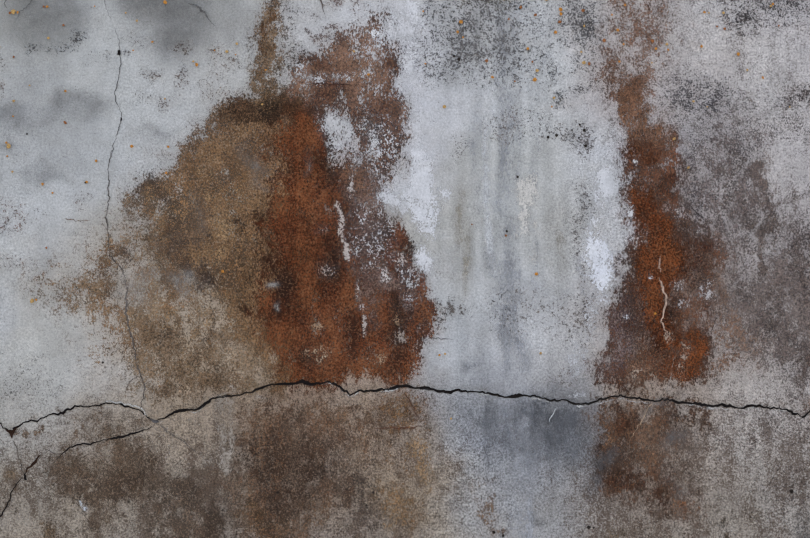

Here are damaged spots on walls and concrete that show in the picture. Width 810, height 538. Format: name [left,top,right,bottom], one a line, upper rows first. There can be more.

crack [105,42,136,360]
leakage [14,403,232,538]
leakage [202,383,236,475]
corrosion [30,0,440,538]
crack [0,363,810,517]
leakage [470,474,506,535]
corrosion [583,0,770,538]
leakage [661,69,810,513]